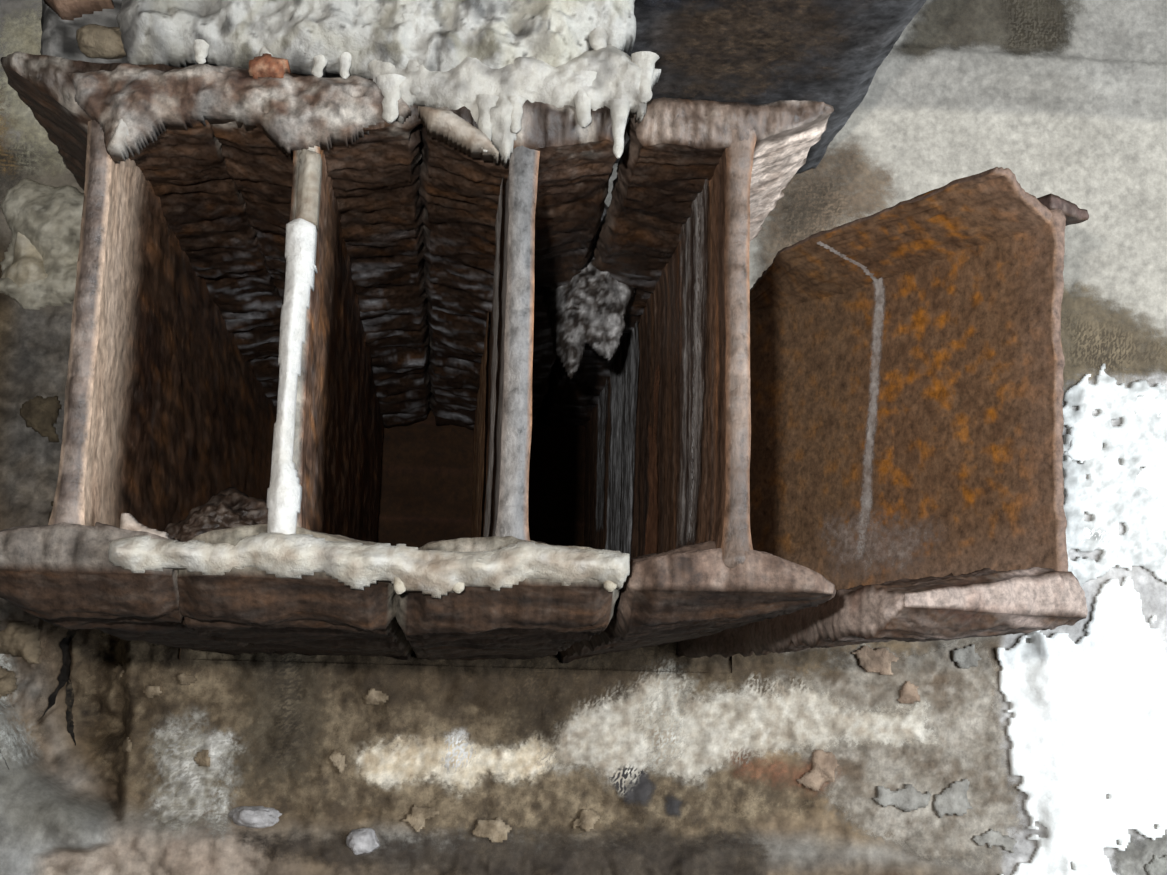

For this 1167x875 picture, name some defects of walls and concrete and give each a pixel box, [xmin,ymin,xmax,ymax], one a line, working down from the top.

damp [900,0,1078,57]
damp [68,0,715,599]
crack [38,629,80,746]